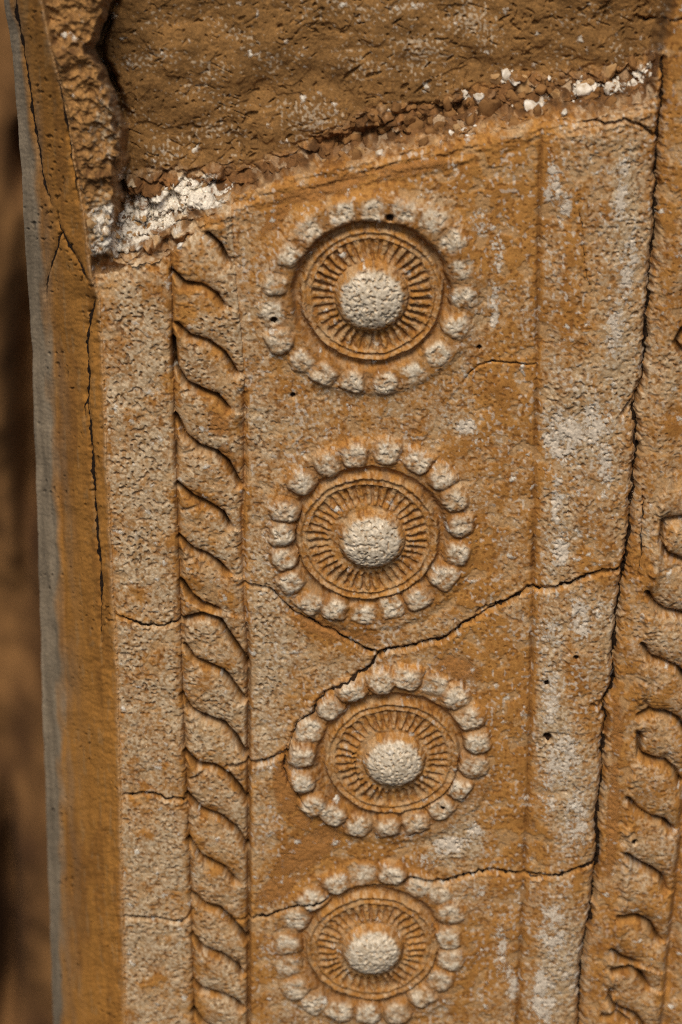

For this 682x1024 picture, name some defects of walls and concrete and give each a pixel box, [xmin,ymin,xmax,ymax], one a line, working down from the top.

spalling [461,90,485,126]
spalling [501,62,653,116]
flaking render [87,173,233,257]
crack [14,0,178,632]
crack [238,56,664,1024]
crack [128,791,185,800]